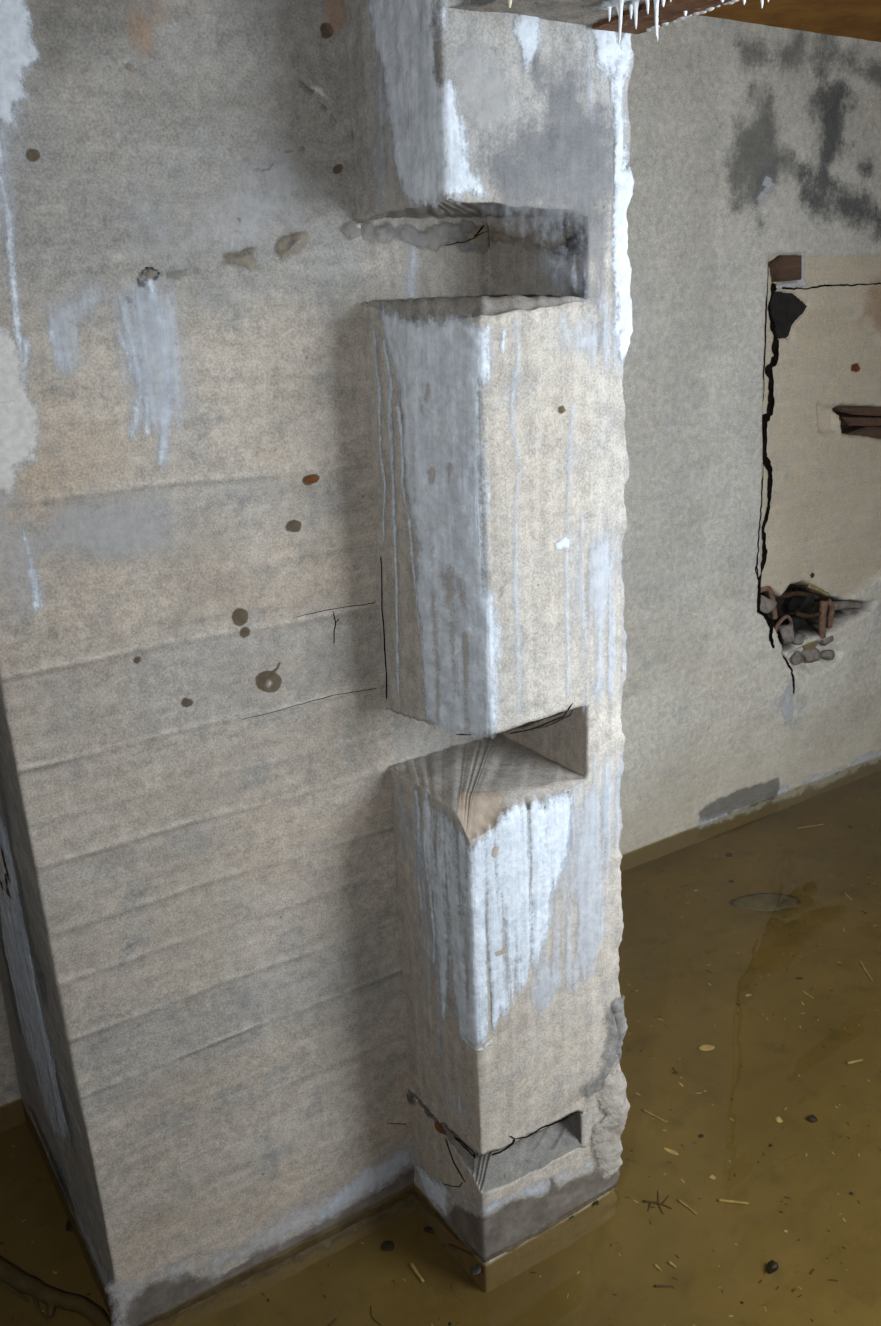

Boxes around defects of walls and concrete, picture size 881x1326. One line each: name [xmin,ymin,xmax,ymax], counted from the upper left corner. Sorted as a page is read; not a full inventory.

leakage [0,0,41,499]
leakage [120,278,180,465]
leakage [368,0,485,207]
spalling [341,217,579,295]
leakage [494,0,739,360]
leakage [776,252,806,288]
leakage [800,80,881,237]
leakage [20,529,43,611]
leakage [372,308,519,739]
crack [755,272,881,694]
crack [509,703,573,734]
leakage [0,765,620,1326]